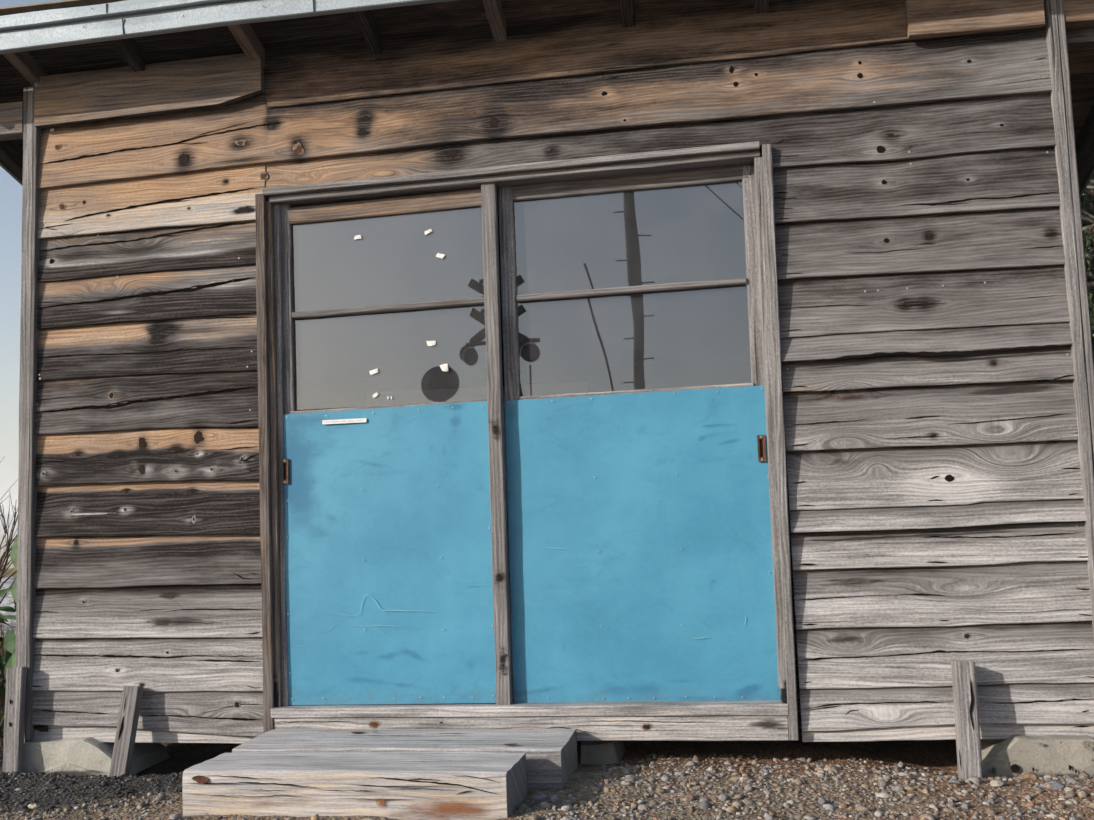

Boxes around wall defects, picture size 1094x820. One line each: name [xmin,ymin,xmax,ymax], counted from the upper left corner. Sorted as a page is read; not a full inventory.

crack [39,120,285,165]
crack [39,188,255,252]